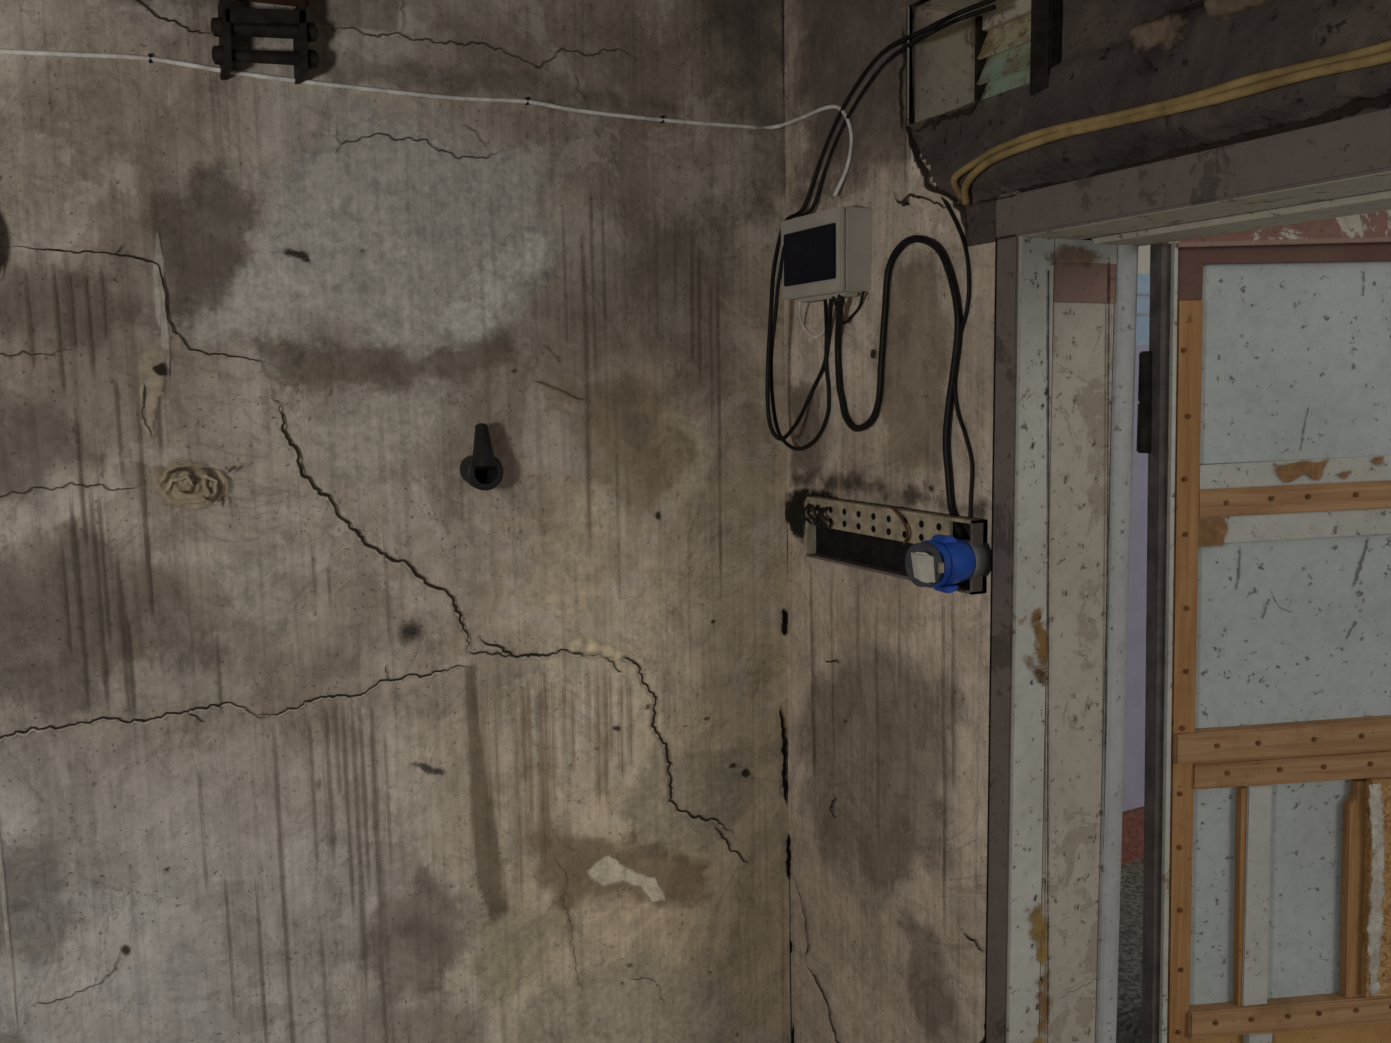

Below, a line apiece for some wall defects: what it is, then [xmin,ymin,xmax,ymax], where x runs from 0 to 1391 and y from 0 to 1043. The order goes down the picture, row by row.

crack [135,0,211,34]
spalling [1127,14,1187,49]
spalling [1204,0,1266,17]
crack [894,31,1391,232]
damp [153,97,565,373]
damp [313,373,458,491]
crack [0,245,747,863]
crack [780,608,788,636]
crack [30,950,121,1007]
crack [554,858,582,988]
spalling [588,855,666,902]
crack [779,707,839,1043]